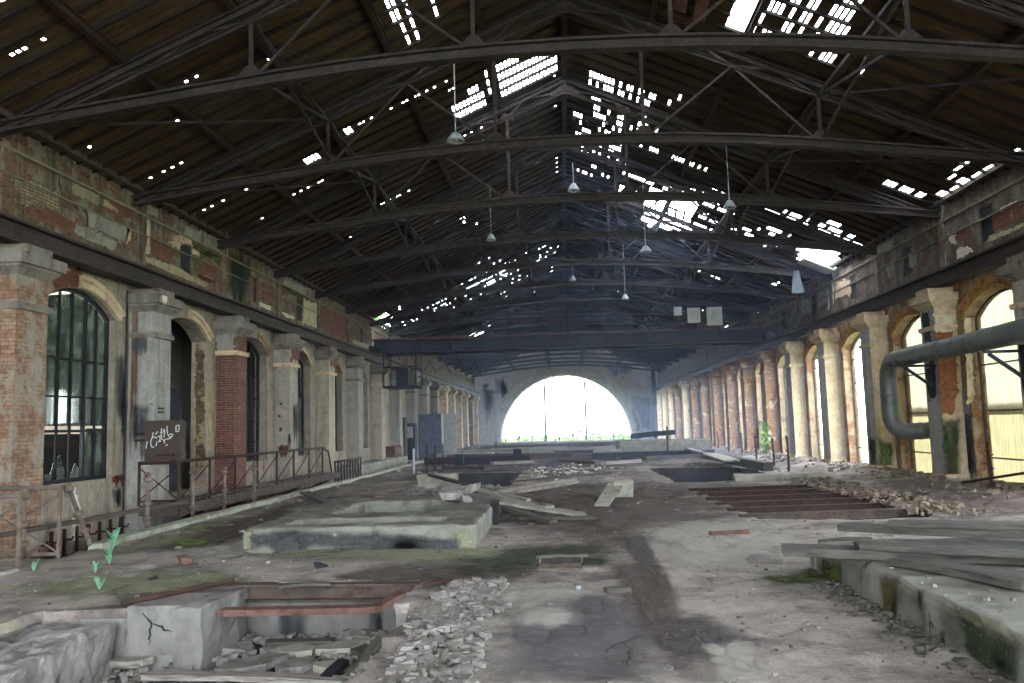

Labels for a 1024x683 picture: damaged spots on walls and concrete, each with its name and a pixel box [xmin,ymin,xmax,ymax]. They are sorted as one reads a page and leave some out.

spalling [19,177,133,251]
flaking render [146,205,208,287]
flaking render [167,225,228,257]
spalling [947,228,974,259]
spalling [987,200,1024,242]
flaking render [259,278,317,328]
water stain [116,337,148,459]
spalling [194,344,216,468]
spalling [926,353,976,416]
crack [142,613,172,644]